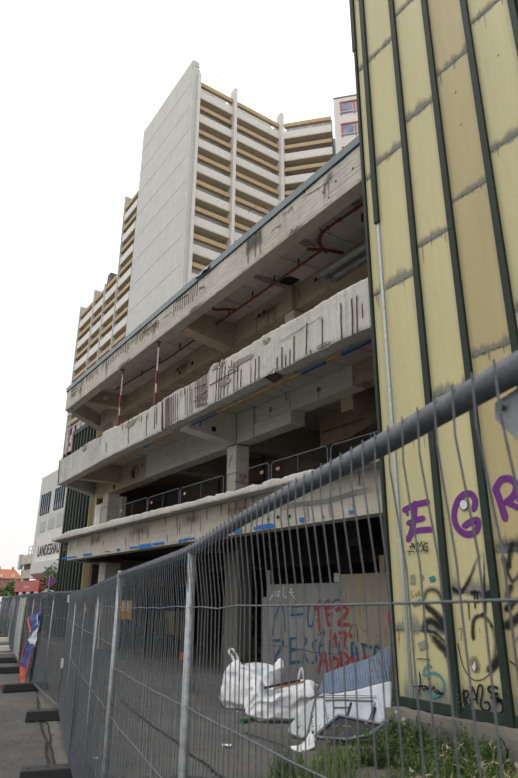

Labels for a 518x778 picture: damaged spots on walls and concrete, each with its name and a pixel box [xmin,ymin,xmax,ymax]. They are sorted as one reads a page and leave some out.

water stain [472,0,499,24]
water stain [437,46,467,76]
water stain [406,97,432,122]
water stain [491,129,518,152]
water stain [453,178,486,202]
water stain [247,228,260,260]